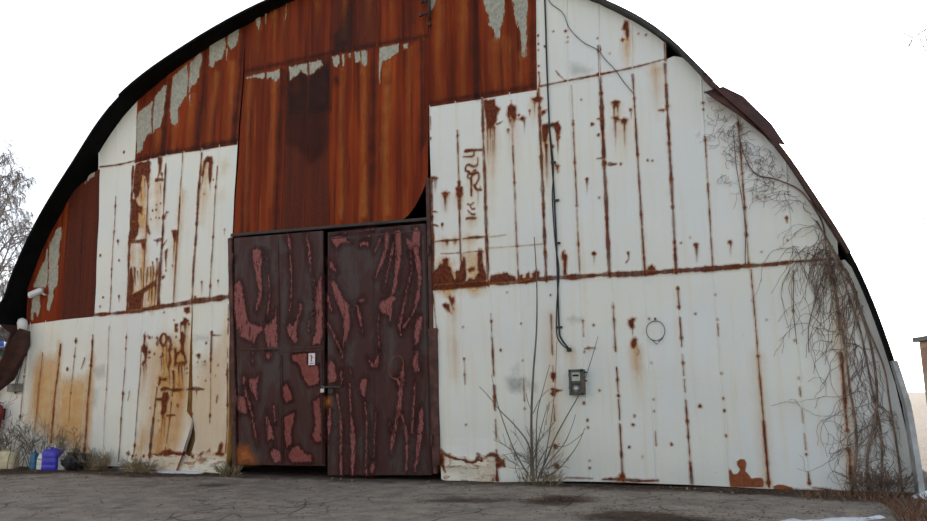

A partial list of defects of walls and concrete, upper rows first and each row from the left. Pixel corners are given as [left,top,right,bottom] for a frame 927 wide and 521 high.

peeling [136,29,239,154]
peeling [246,50,368,82]
peeling [378,43,408,84]
peeling [483,0,528,57]
peeling [30,227,63,321]
corrosion [94,4,423,461]
corrosion [431,27,833,491]
corrosion [34,334,93,453]
peeling [234,232,378,476]
peeling [332,226,424,472]